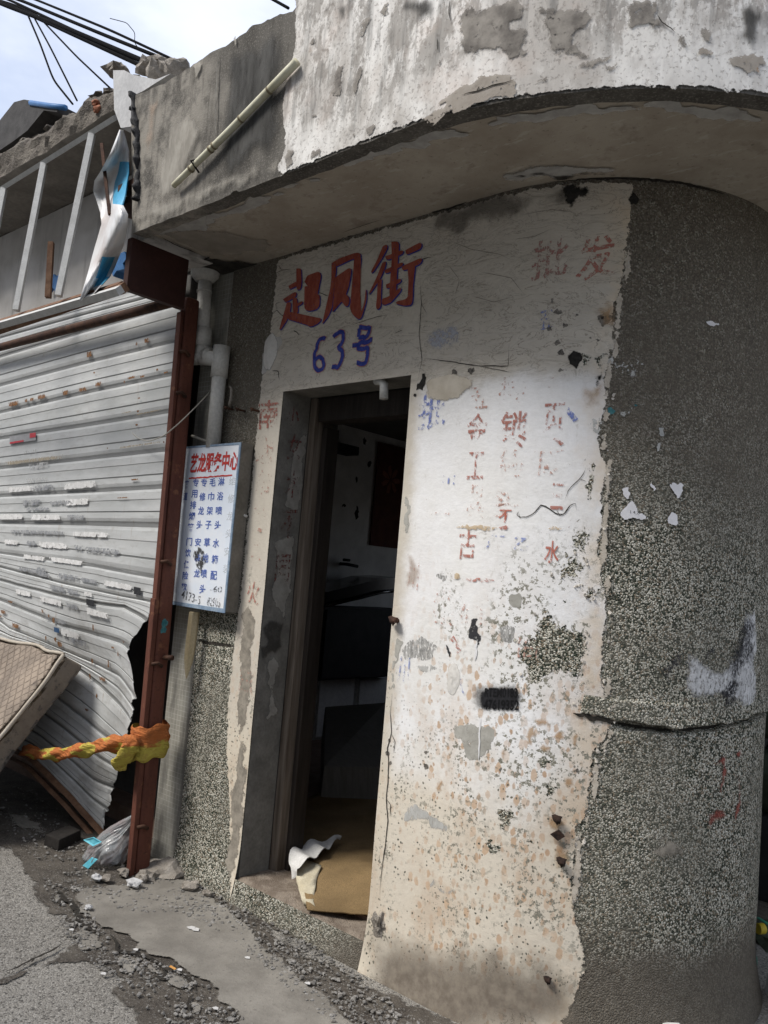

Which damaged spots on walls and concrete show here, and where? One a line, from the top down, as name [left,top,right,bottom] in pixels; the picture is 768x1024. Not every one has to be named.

peeling [458,0,527,58]
peeling [539,7,617,70]
peeling [628,0,661,28]
peeling [729,54,766,73]
peeling [343,74,516,166]
peeling [157,179,320,235]
peeling [499,600,590,713]
crack [380,699,395,884]